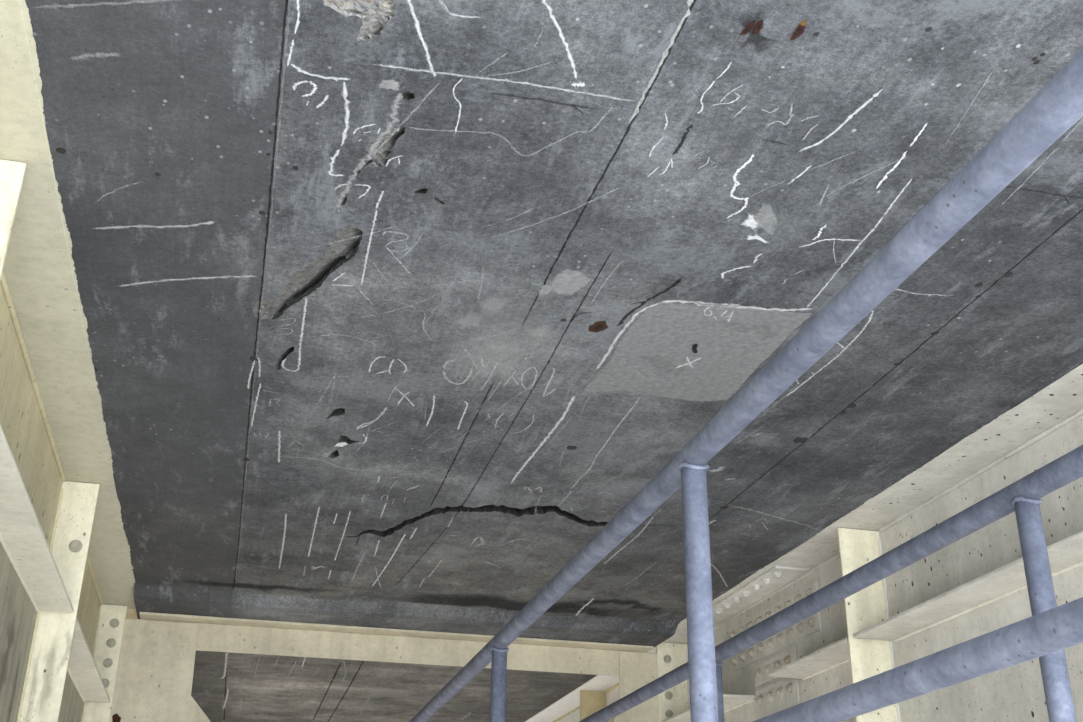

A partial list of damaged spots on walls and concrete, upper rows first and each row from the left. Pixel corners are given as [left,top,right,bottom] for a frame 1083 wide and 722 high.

spalling [323,0,395,41]
corrosion [740,20,763,35]
corrosion [790,20,807,40]
spalling [334,80,407,215]
spalling [253,227,363,320]
crack [347,500,608,545]